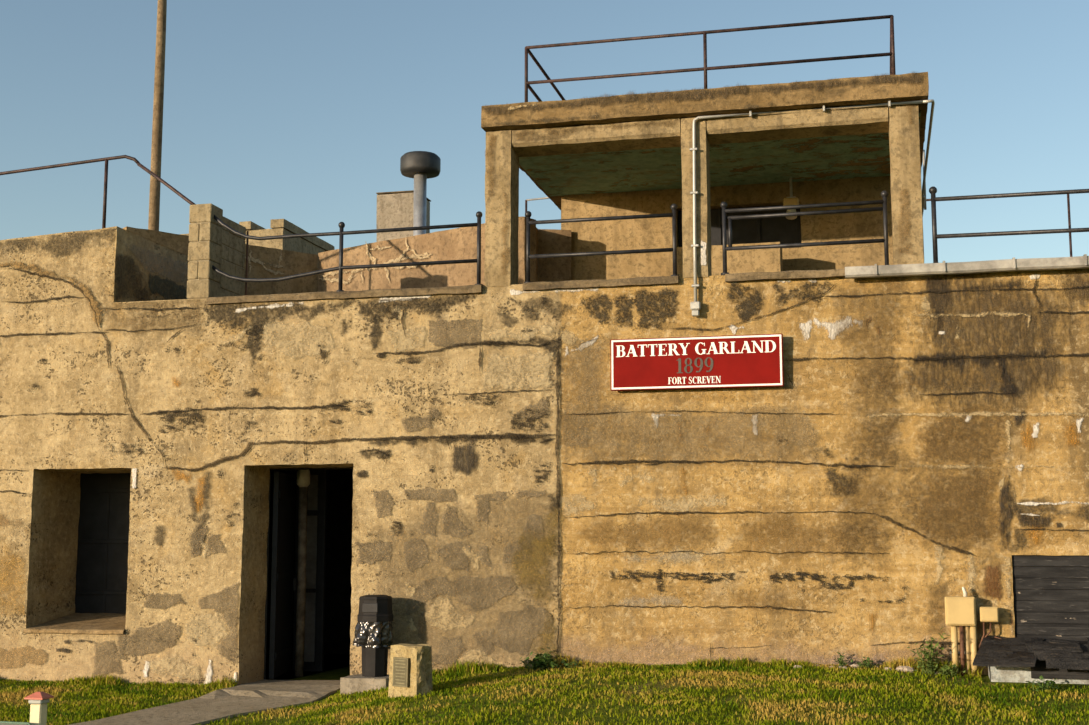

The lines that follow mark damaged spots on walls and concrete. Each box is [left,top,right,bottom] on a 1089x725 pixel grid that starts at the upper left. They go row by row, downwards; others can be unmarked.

crack [245,246,286,275]
crack [320,239,432,284]
water stain [484,288,598,363]
water stain [800,317,863,339]
crack [671,272,1089,331]
crack [785,353,1089,408]
water stain [907,273,1070,471]
water stain [569,345,867,496]
crack [0,296,977,659]
water stain [999,475,1089,598]
crack [1016,525,1089,533]